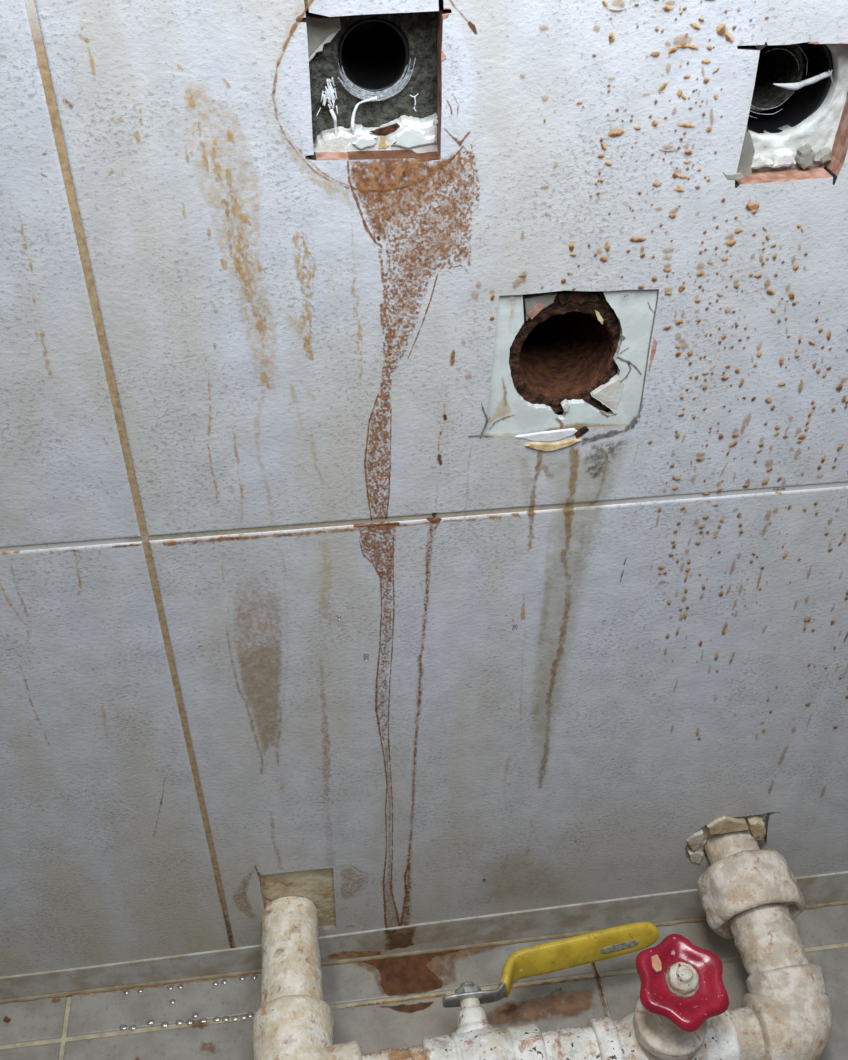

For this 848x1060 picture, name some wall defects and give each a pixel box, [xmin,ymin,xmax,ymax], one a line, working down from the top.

peeling [524,290,604,325]
spalling [648,338,657,372]
spalling [515,426,589,452]
rust [328,123,497,1013]
spalling [687,815,766,864]